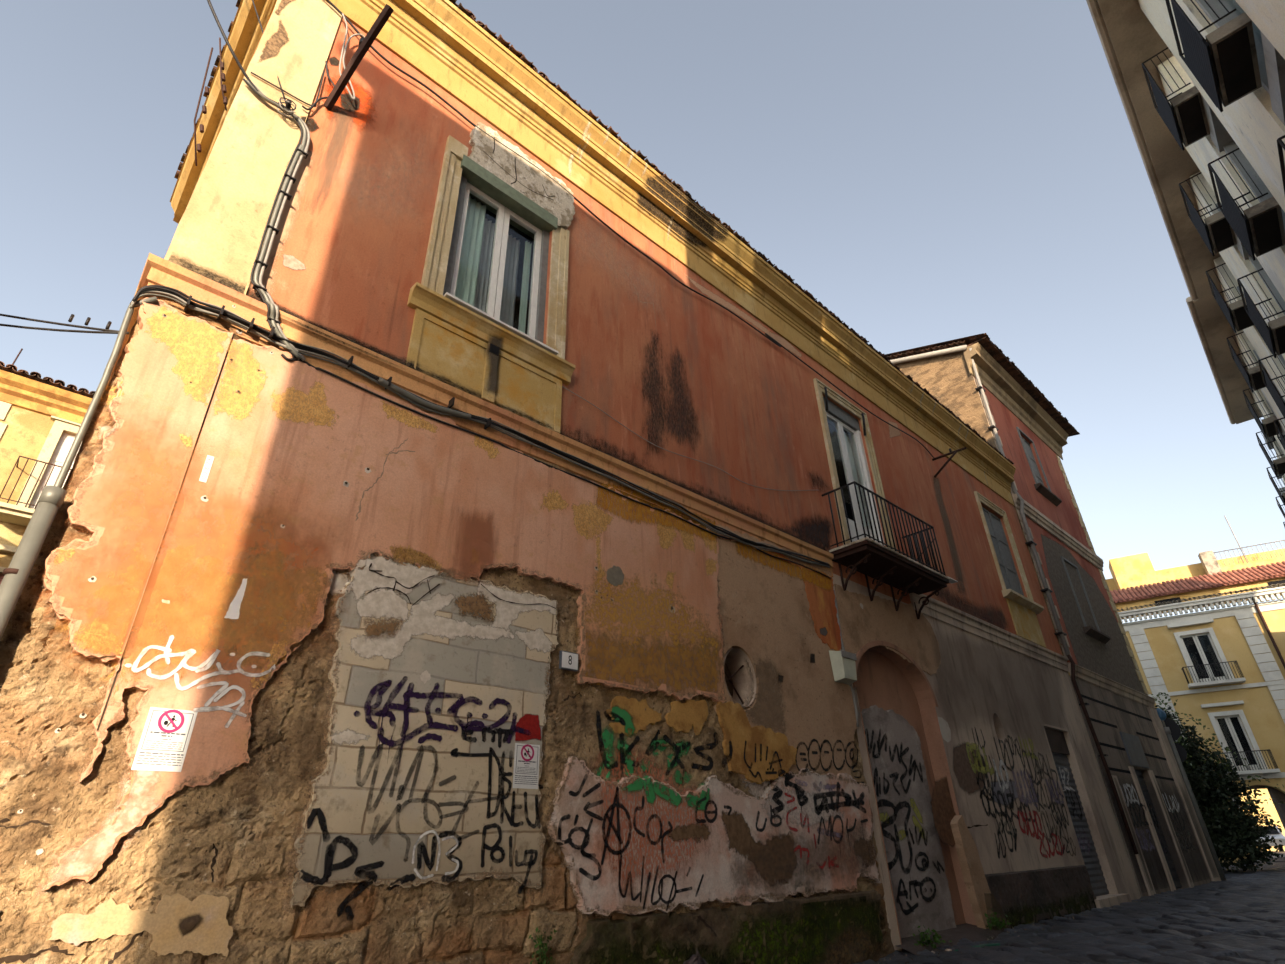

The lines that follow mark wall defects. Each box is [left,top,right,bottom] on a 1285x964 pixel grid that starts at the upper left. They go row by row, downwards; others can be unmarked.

corrosion [327,79,374,127]
spalling [468,122,575,230]
water stain [569,122,633,175]
water stain [638,167,728,247]
water stain [169,259,831,550]
spalling [0,305,895,964]